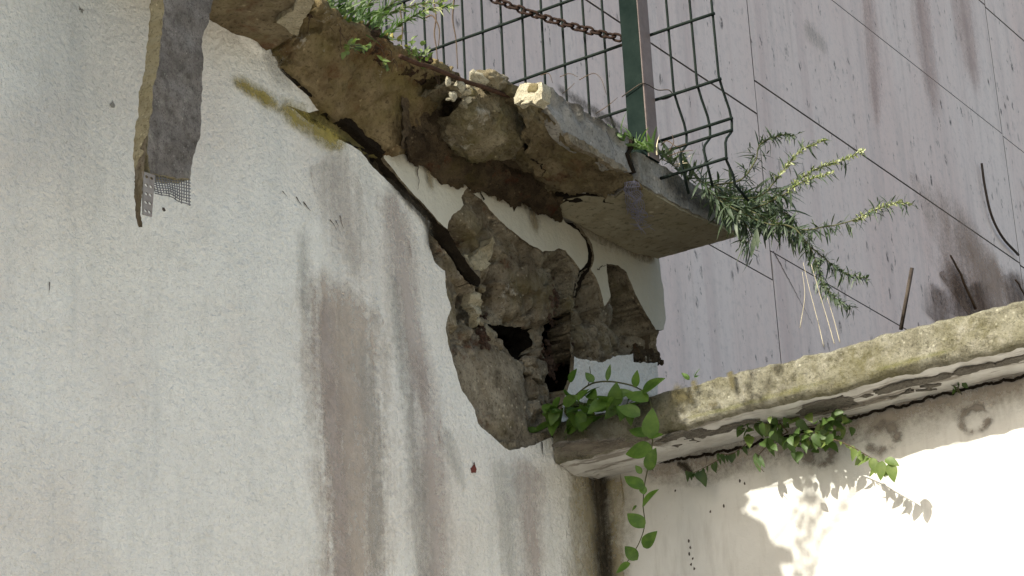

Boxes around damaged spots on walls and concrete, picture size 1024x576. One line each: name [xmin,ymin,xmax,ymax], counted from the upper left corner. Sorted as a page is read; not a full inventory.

spalling [153,174,191,211]
damp [235,79,278,109]
spalling [307,112,378,159]
crack [280,60,480,287]
crack [531,131,636,298]
damp [388,184,433,373]
spalling [428,189,660,450]
damp [311,280,383,576]
peeling [656,419,760,472]
damp [768,373,1024,466]
peeling [796,354,1024,415]
damp [571,476,624,576]